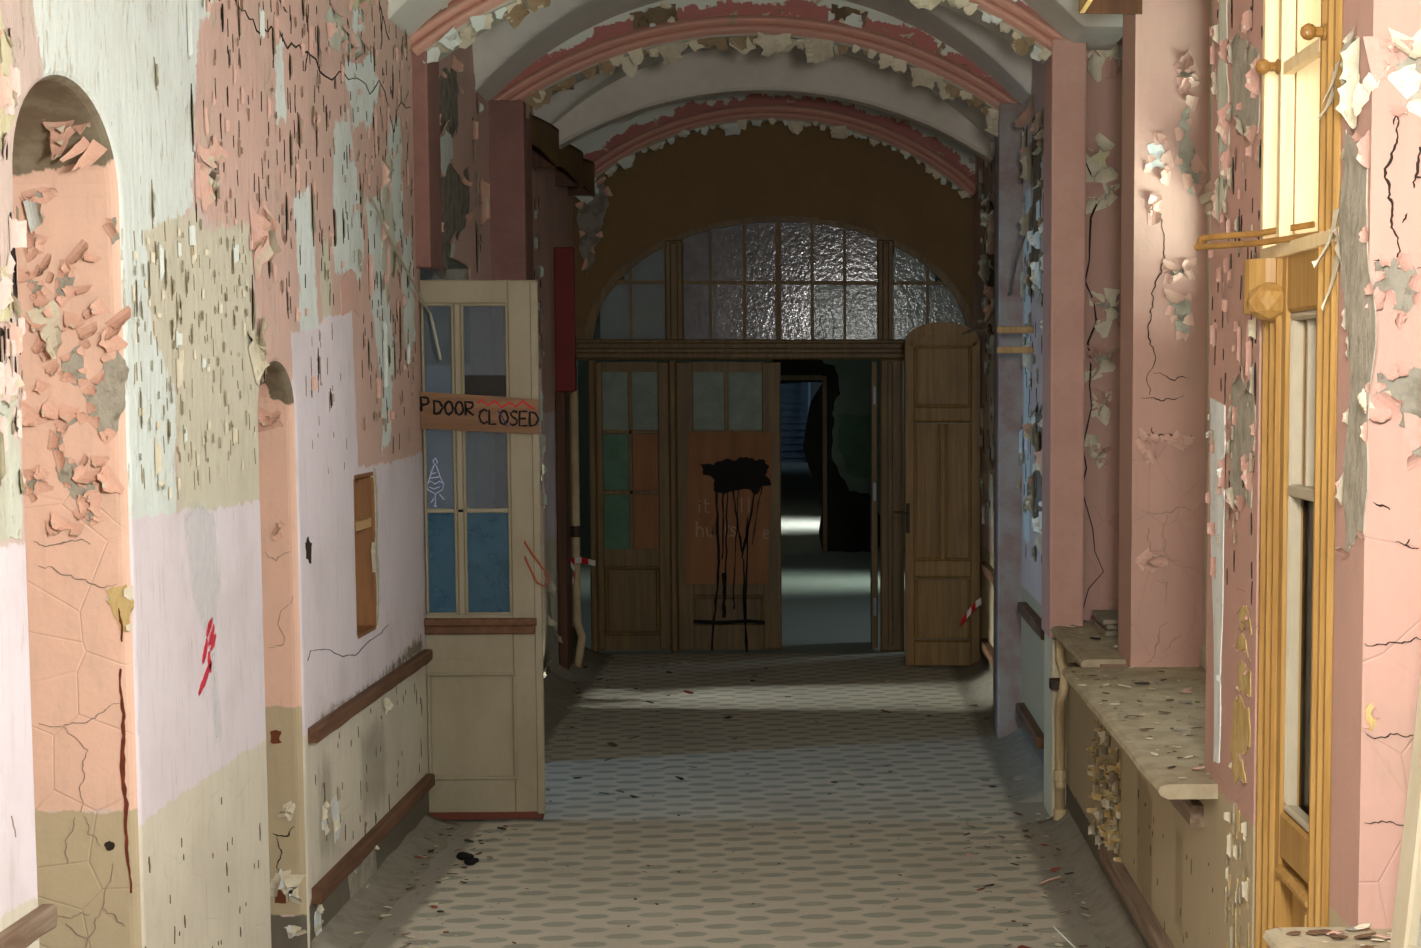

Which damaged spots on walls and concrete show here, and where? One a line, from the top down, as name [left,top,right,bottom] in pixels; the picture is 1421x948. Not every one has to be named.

crack [209,0,411,133]
peeling [0,0,551,542]
peeling [524,0,1051,563]
crack [1143,219,1192,437]
peeling [1312,22,1421,560]
crack [1374,116,1421,269]
crack [34,539,116,588]
peeling [105,584,134,632]
spalling [370,468,379,630]
peeling [1135,0,1263,948]
crack [39,699,125,948]
peeling [1086,719,1164,863]